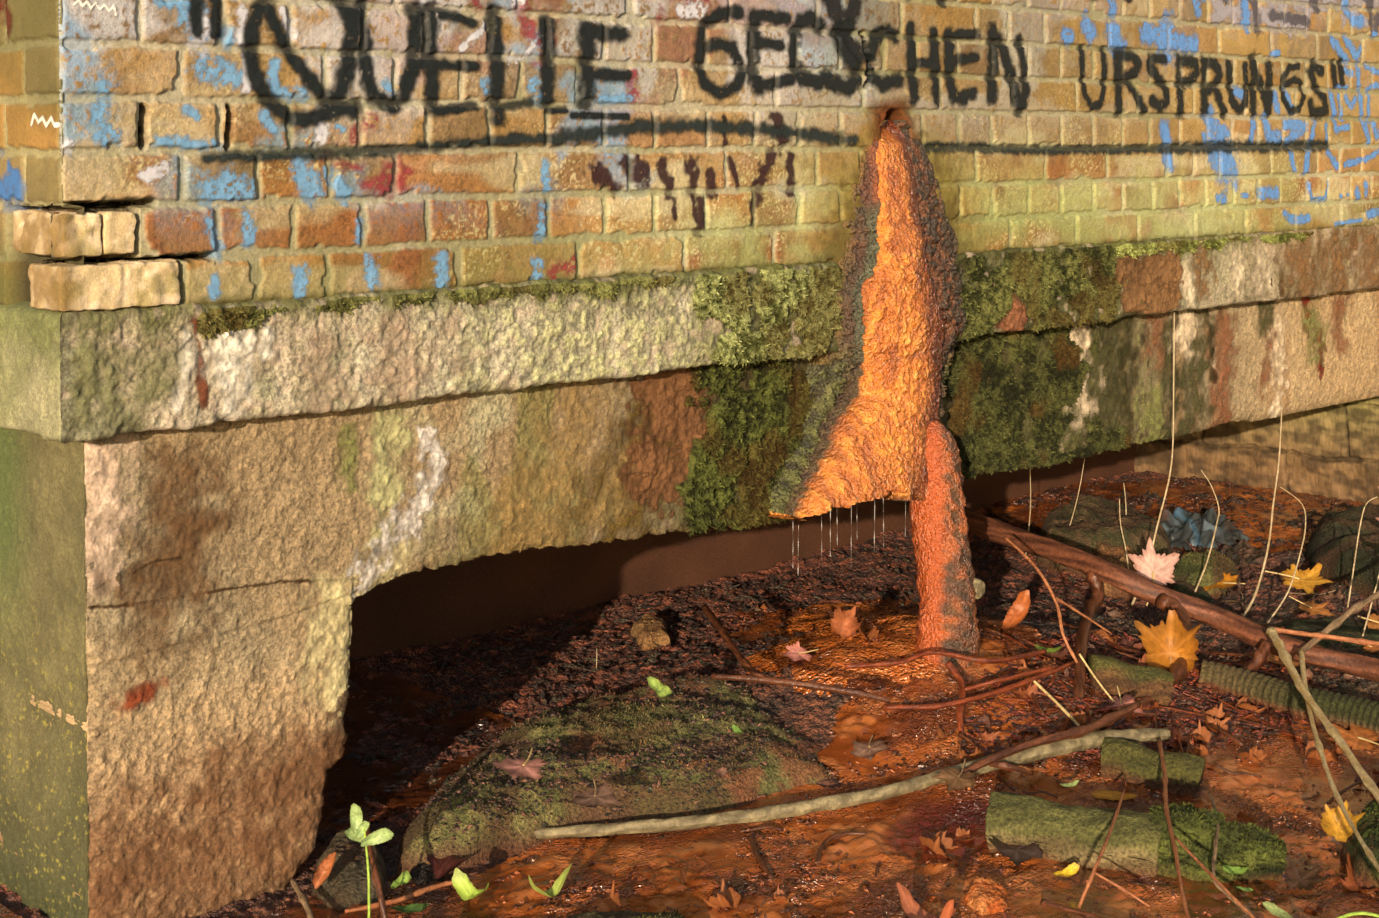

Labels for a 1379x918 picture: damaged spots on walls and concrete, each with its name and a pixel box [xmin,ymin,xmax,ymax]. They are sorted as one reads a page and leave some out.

rust [874,104,916,140]
crack [88,557,181,609]
crack [207,578,335,594]